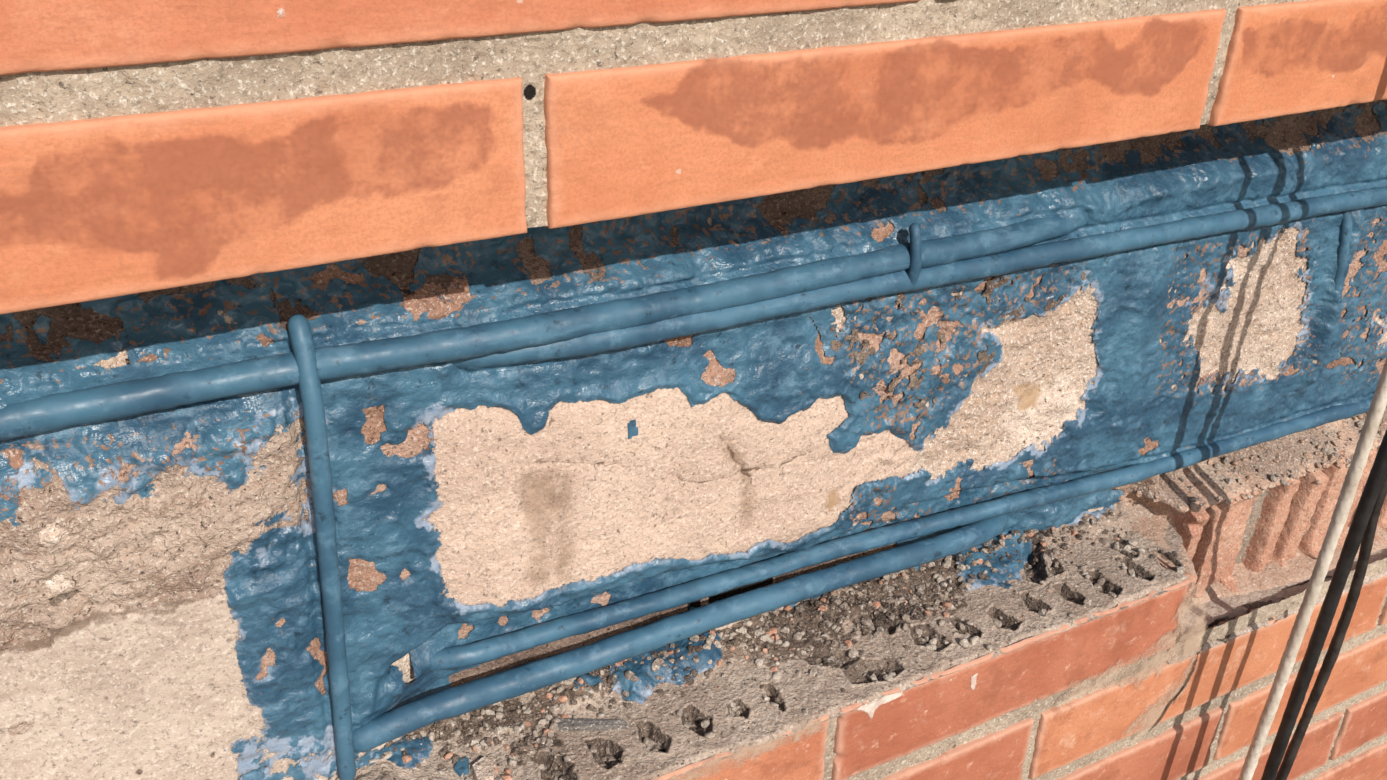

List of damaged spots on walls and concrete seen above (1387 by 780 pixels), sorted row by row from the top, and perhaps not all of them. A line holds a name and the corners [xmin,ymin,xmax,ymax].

spalling [0,277,319,653]
peeling [309,185,1387,753]
spalling [0,720,35,736]
peeling [256,647,276,681]
peeling [305,638,329,696]
crack [1148,610,1250,732]